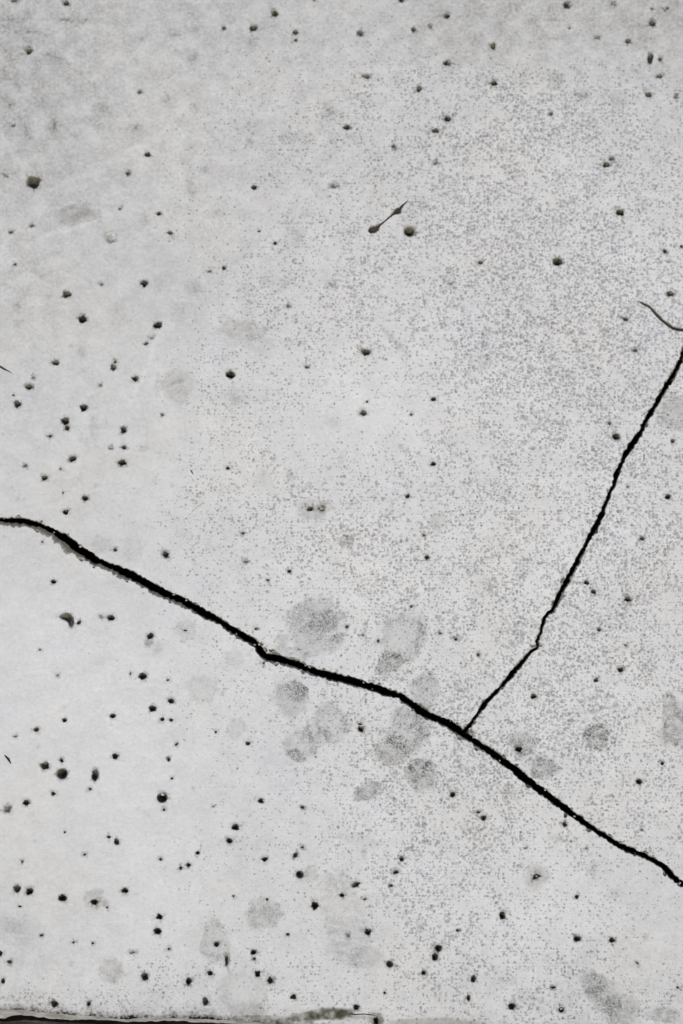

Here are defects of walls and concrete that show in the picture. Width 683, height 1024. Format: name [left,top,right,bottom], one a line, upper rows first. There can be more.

crack [0,301,683,887]